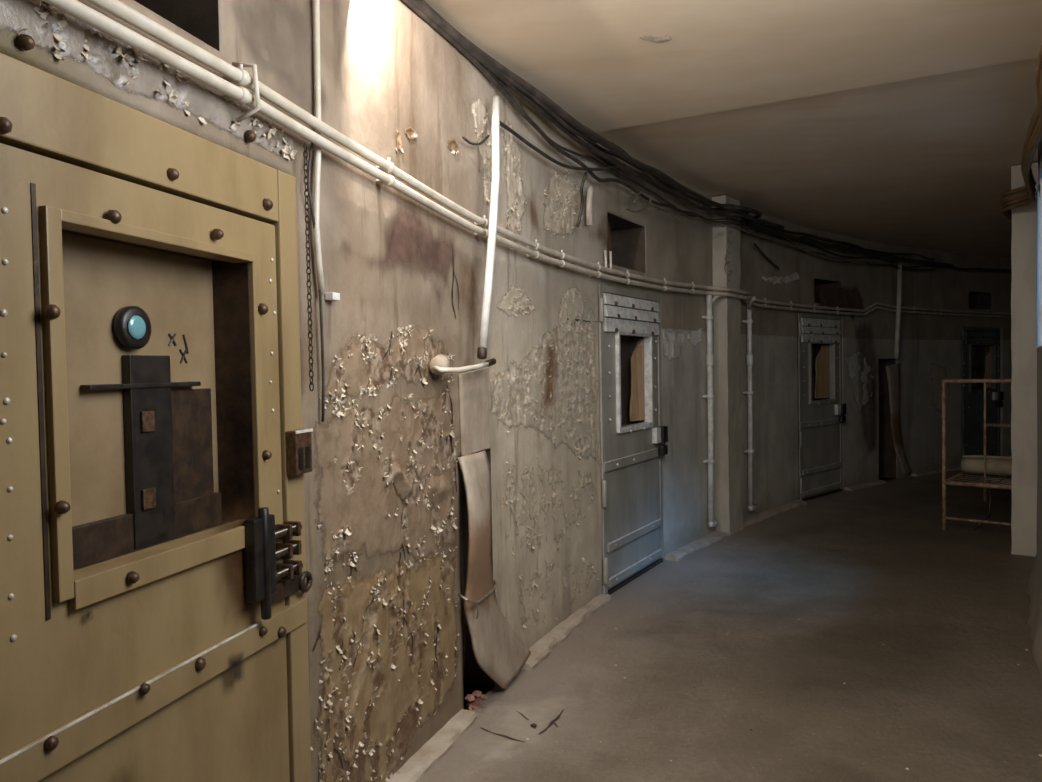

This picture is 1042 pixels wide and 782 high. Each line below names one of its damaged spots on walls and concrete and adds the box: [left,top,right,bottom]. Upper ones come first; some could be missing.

peeling [0,0,298,160]
peeling [470,98,526,233]
peeling [542,169,584,239]
peeling [490,284,601,465]
peeling [311,324,460,782]